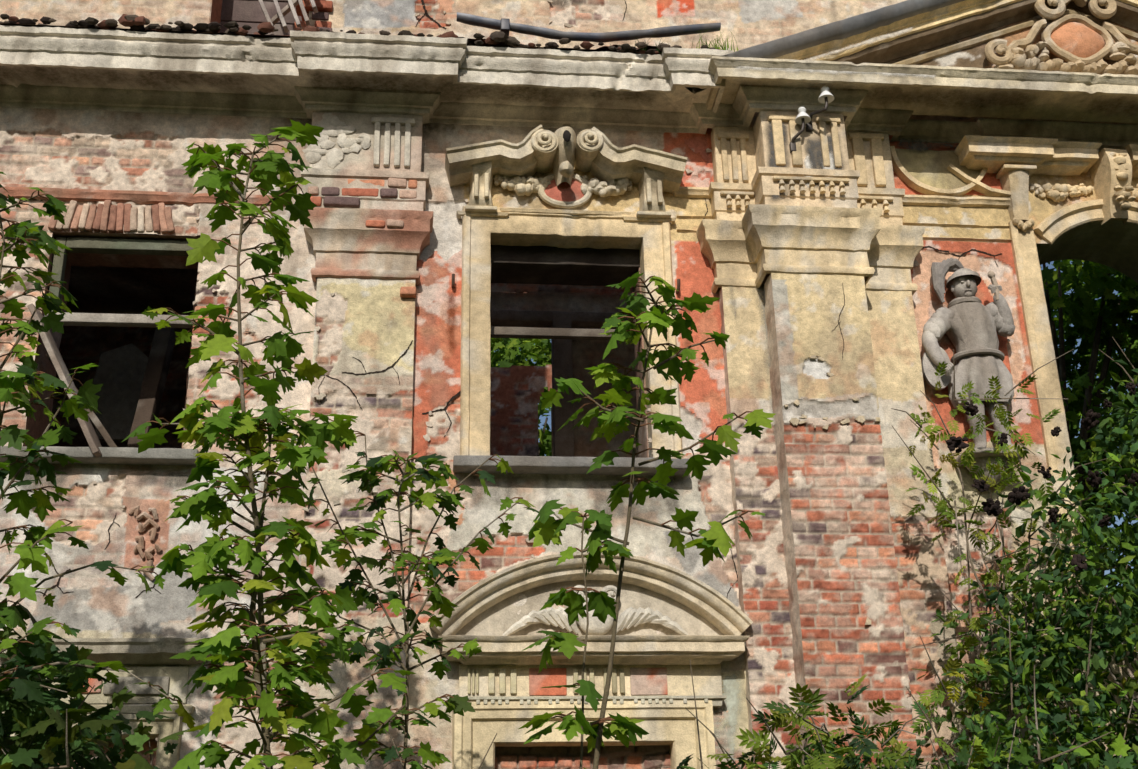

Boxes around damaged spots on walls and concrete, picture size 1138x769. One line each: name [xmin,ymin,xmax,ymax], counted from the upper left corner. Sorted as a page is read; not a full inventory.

crack [415,0,447,29]
flaking render [681,134,712,184]
spalling [0,127,200,392]
spalling [315,288,349,376]
crack [318,340,413,409]
flaking render [803,355,834,379]
crack [832,283,845,359]
spalling [1,402,27,446]
crack [422,390,461,437]
spalling [32,474,128,547]
spalling [302,386,546,622]
spalling [699,394,1016,769]